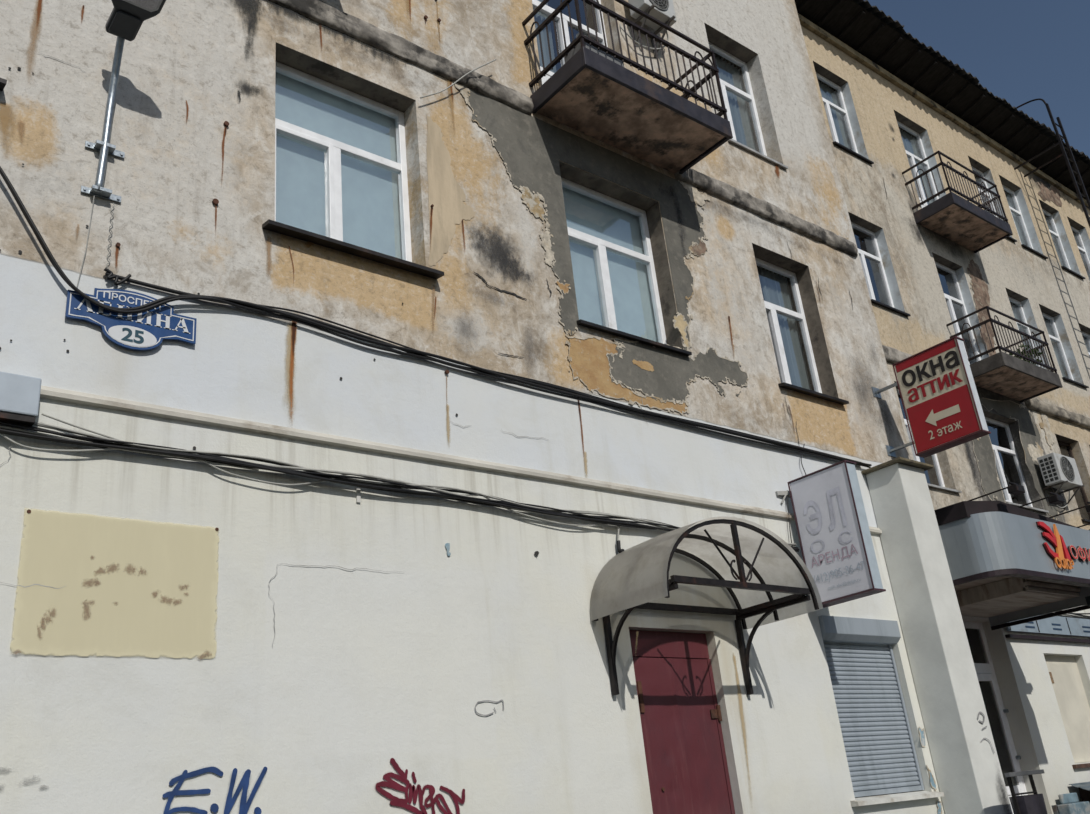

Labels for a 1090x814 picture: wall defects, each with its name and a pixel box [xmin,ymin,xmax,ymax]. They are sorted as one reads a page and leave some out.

rust [30,0,42,63]
damp [235,0,306,53]
damp [322,24,354,42]
flaking render [452,81,748,415]
rust [286,321,297,417]
crack [269,563,401,647]